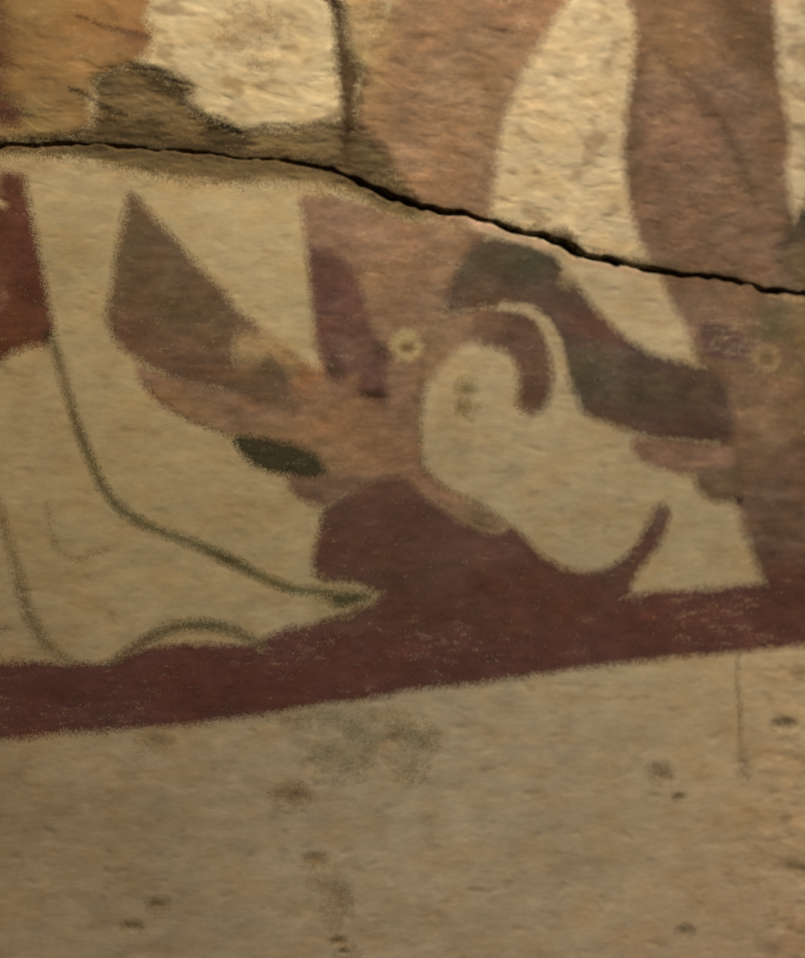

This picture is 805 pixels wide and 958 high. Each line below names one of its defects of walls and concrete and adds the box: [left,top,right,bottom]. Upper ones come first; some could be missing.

crack [0,0,805,303]